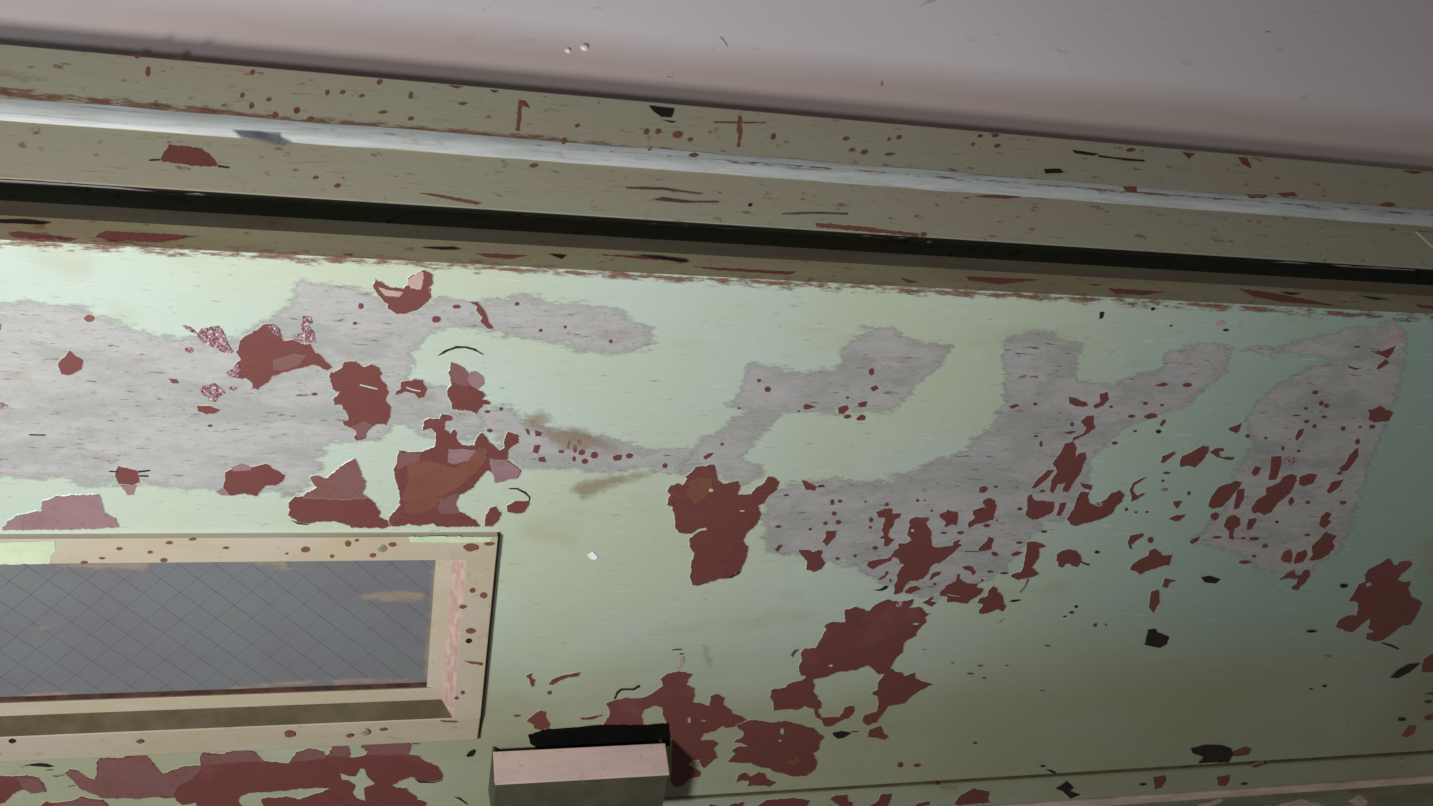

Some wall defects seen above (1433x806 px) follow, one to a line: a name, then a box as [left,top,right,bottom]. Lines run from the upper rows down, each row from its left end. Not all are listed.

peeling [603,254,796,275]
peeling [0,269,1404,806]
peeling [1335,557,1423,649]
peeling [1390,652,1433,678]
peeling [1398,693,1433,738]